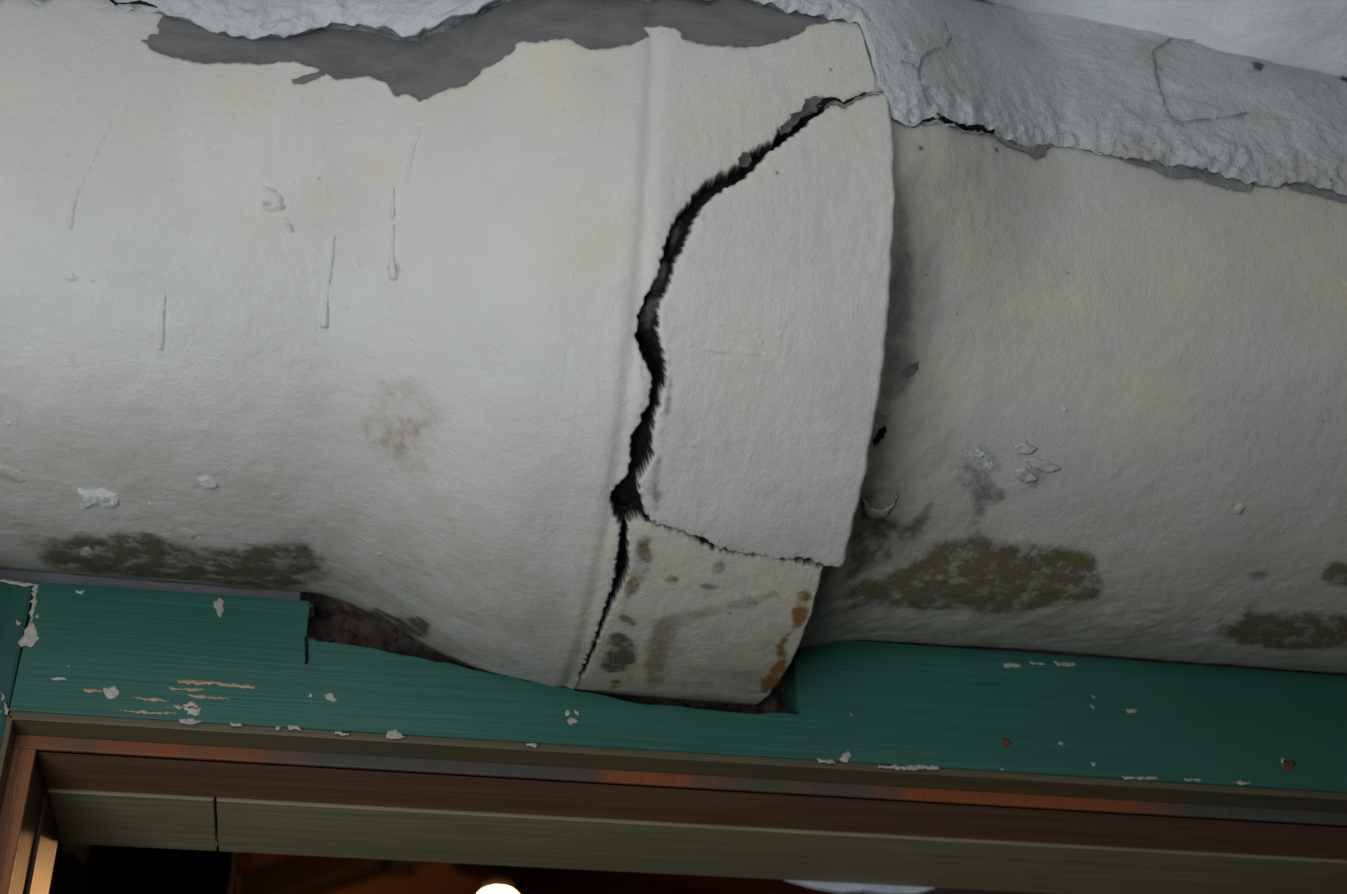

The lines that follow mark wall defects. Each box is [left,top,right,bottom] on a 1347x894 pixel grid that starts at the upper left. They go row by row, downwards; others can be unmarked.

peeling [142,0,846,102]
crack [900,22,995,134]
crack [1152,38,1249,123]
crack [609,91,882,596]
peeling [0,579,40,647]
leakage [42,534,318,589]
peeling [214,597,225,618]
corrosion [761,592,810,693]
leakage [846,516,1101,613]
leakage [1220,611,1347,650]
leakage [1324,564,1347,586]
peeling [83,679,256,725]